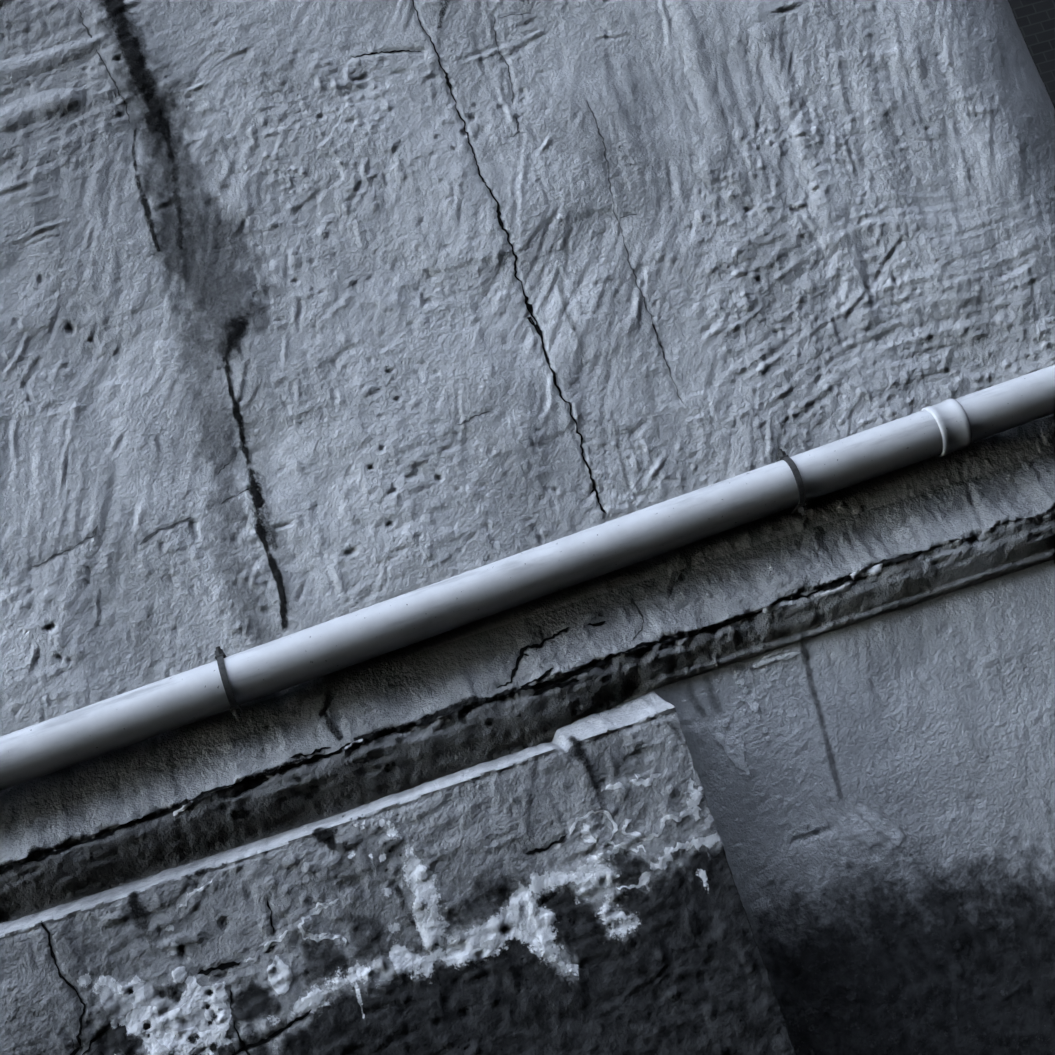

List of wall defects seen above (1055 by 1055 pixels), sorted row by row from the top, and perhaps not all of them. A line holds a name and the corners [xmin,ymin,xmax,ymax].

water stain [101,0,288,630]
crack [351,0,606,513]
spalling [681,614,742,638]
spalling [814,552,918,597]
spalling [144,792,211,820]
crack [0,550,927,891]
spalling [421,688,517,726]
water stain [568,736,601,803]
water stain [819,796,903,852]
crack [41,921,116,1055]
crack [198,899,347,1055]
water stain [77,816,1055,1055]